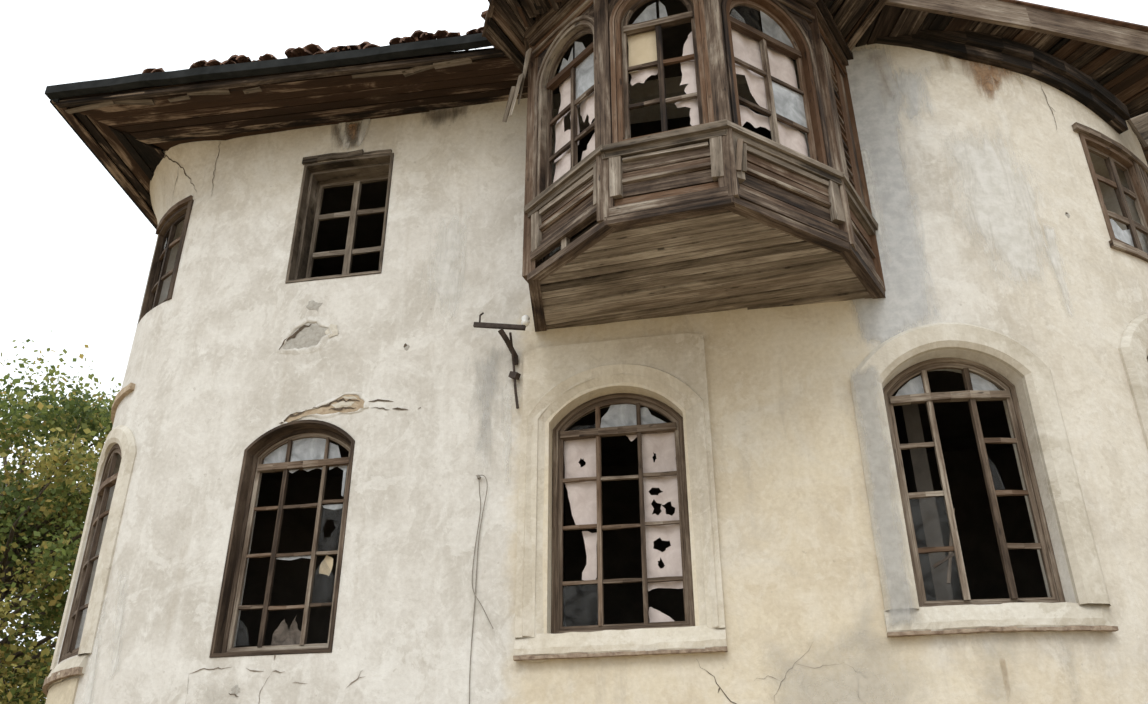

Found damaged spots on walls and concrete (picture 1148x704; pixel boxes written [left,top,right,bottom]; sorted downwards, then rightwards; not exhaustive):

crack [163,149,220,198]
flaking render [276,300,338,355]
flaking render [279,392,370,424]
crack [185,655,307,704]
crack [756,644,879,704]